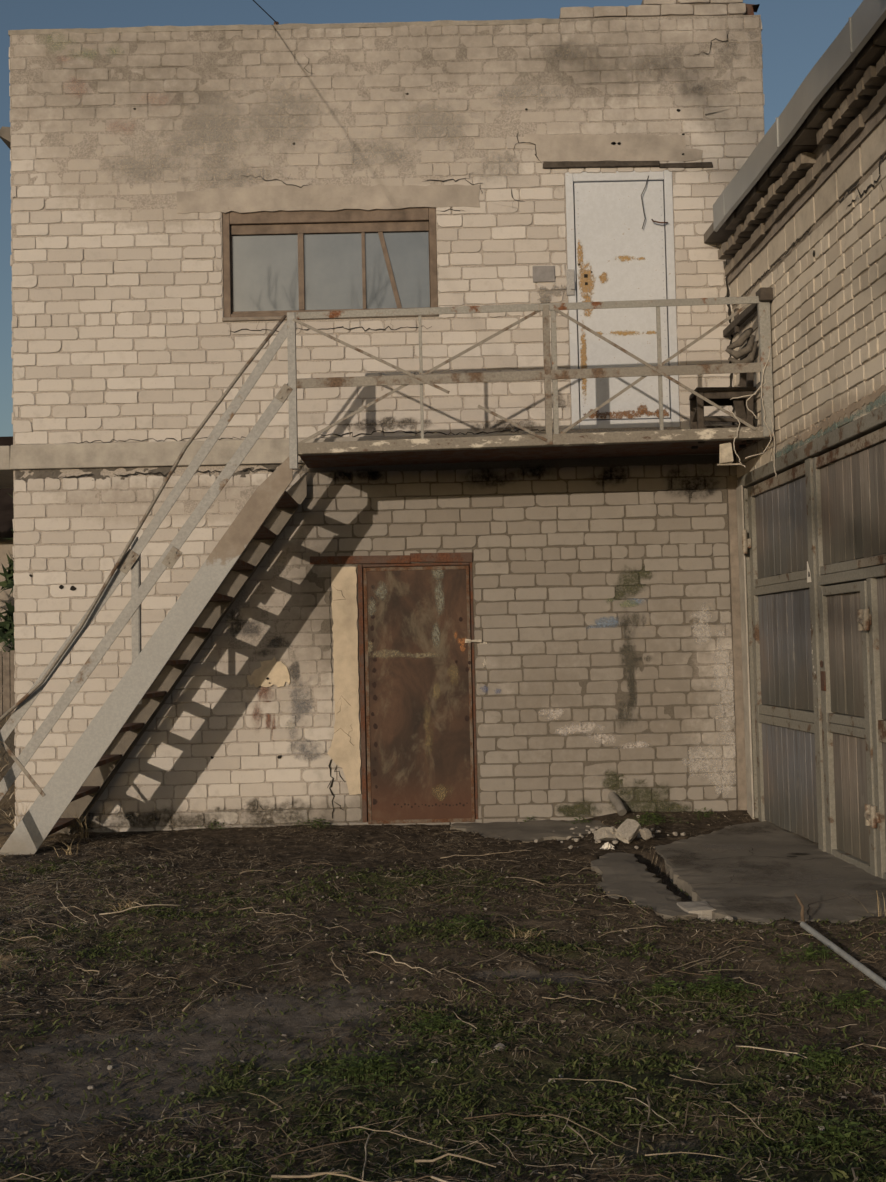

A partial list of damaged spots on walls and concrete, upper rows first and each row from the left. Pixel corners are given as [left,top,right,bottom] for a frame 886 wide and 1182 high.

crack [242,175,306,188]
crack [836,153,886,209]
crack [327,587,354,819]
leakage [611,589,642,722]